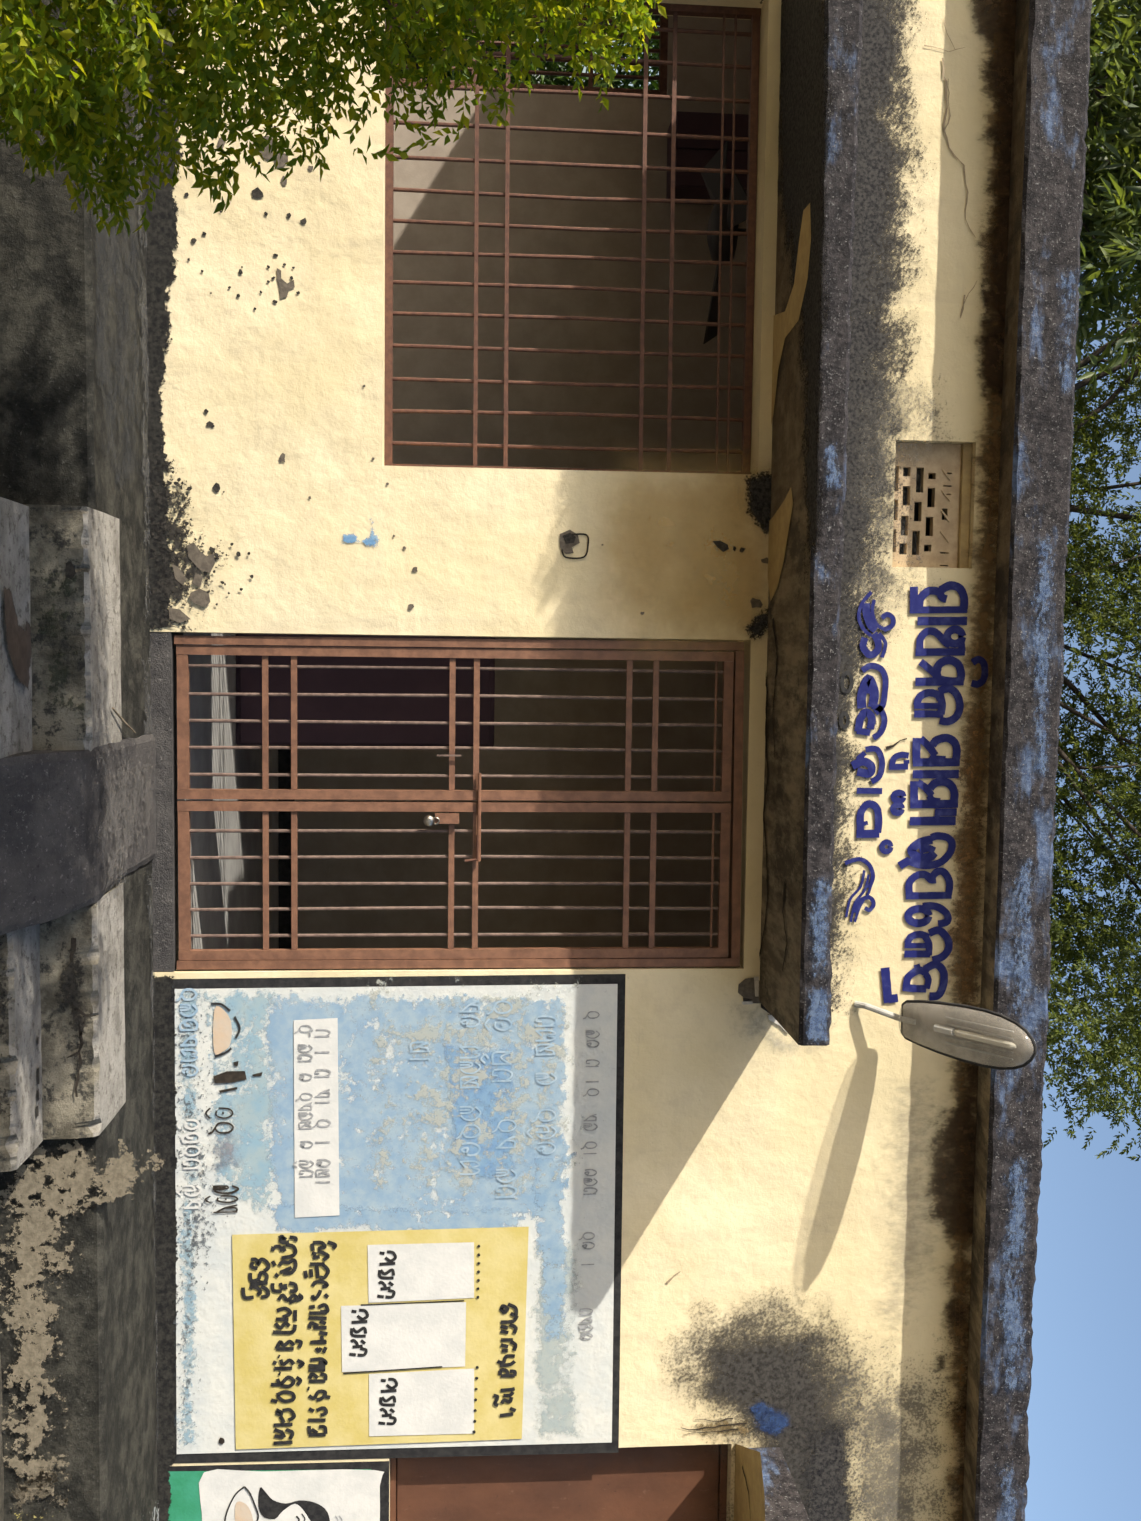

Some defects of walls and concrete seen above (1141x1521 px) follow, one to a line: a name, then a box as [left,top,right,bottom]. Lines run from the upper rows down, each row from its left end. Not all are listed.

leakage [145,0,184,631]
peeling [252,187,268,216]
peeling [258,125,288,186]
crack [924,17,976,238]
crack [960,281,977,318]
leakage [972,0,1016,394]
leakage [636,471,772,613]
leakage [759,0,947,1014]
leakage [948,711,991,1008]
leakage [928,1063,978,1234]
leakage [667,1292,969,1521]